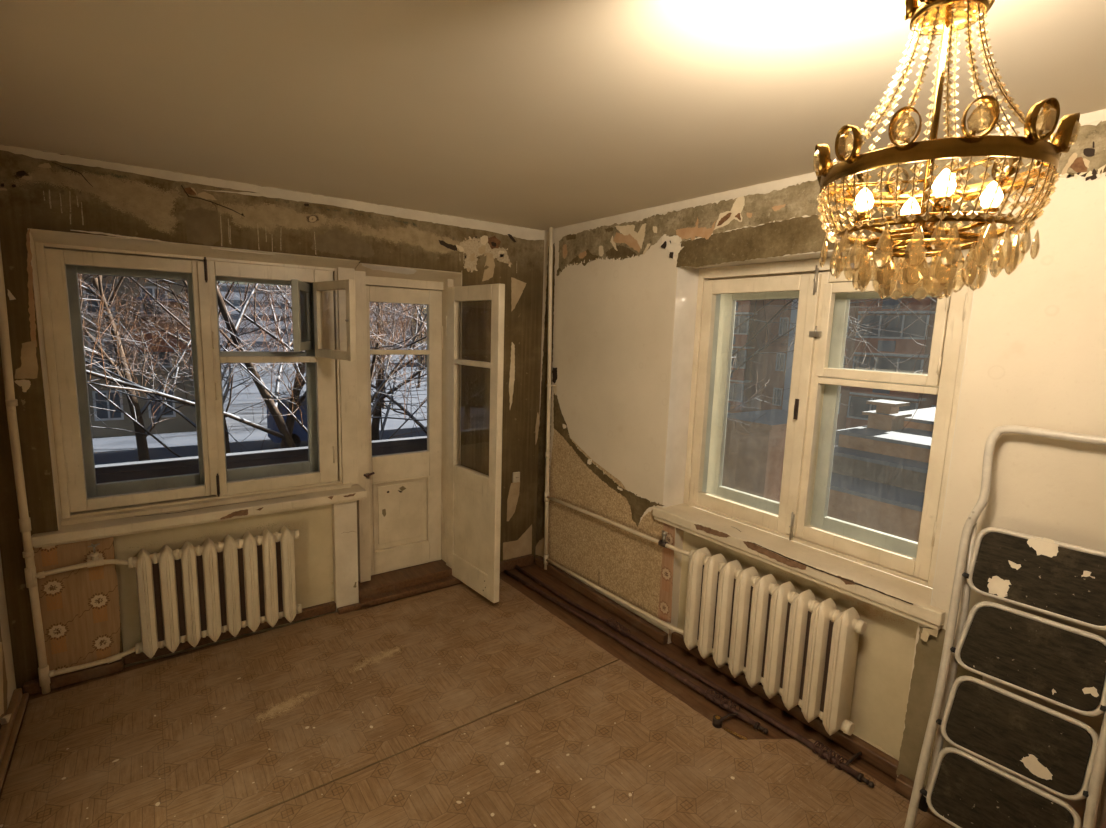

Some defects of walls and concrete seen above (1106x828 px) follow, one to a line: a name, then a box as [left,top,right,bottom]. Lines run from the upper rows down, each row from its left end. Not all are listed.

spalling [836,157,1034,192]
spalling [1055,121,1106,182]
peeling [0,163,516,281]
spalling [556,180,903,276]
flaking render [917,200,983,233]